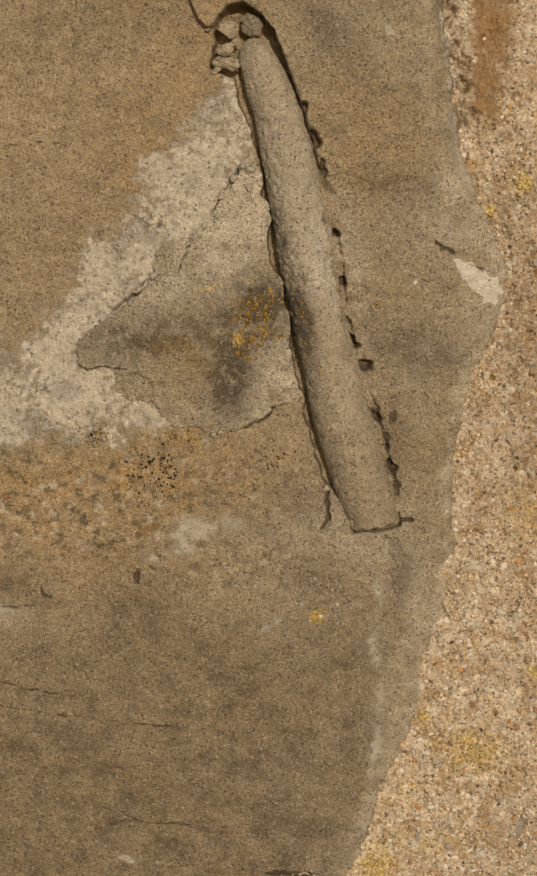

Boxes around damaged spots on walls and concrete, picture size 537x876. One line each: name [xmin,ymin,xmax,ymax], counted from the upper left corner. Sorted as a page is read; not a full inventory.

peeling [0,76,304,451]
crack [231,403,287,432]
crack [0,682,69,717]
crack [265,868,317,876]